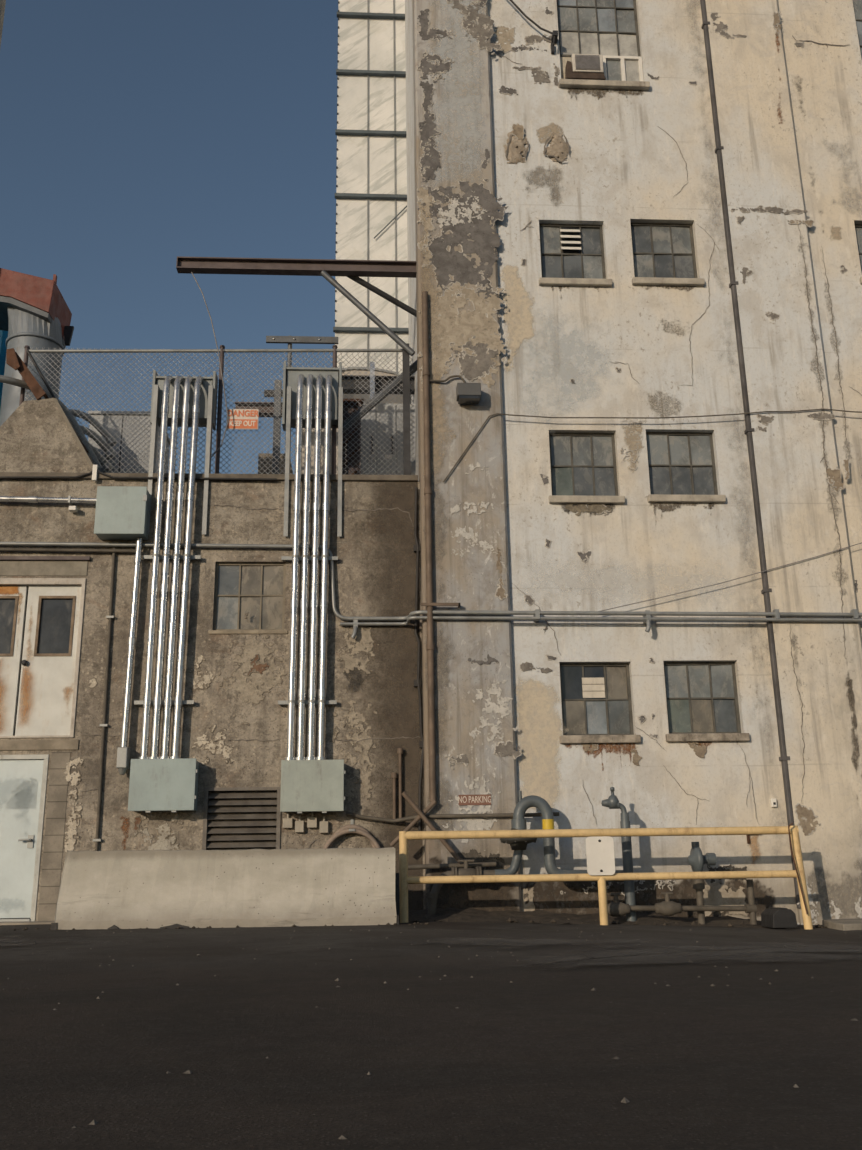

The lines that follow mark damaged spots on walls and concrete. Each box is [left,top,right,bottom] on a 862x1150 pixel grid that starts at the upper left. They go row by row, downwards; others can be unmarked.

peeling [417,0,570,392]
crack [689,227,720,386]
corrosion [0,586,22,612]
corrosion [22,669,32,720]
peeling [469,715,522,759]
water stain [846,675,859,770]
peeling [444,754,501,807]